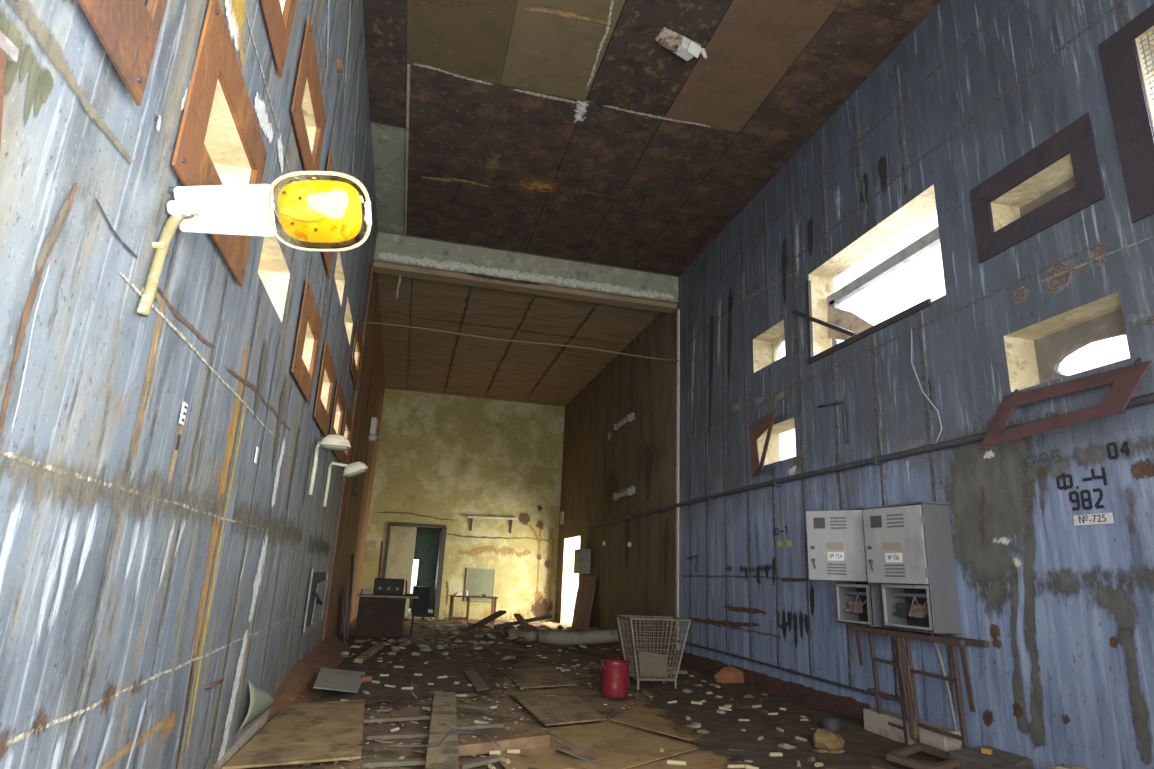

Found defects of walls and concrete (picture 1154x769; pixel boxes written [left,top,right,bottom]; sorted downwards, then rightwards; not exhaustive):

leakage [254,343,267,418]
leakage [272,378,287,471]
leakage [0,448,224,638]
leakage [235,429,329,588]
rust [0,729,9,759]
rust [33,711,47,736]
leakage [1118,628,1151,764]